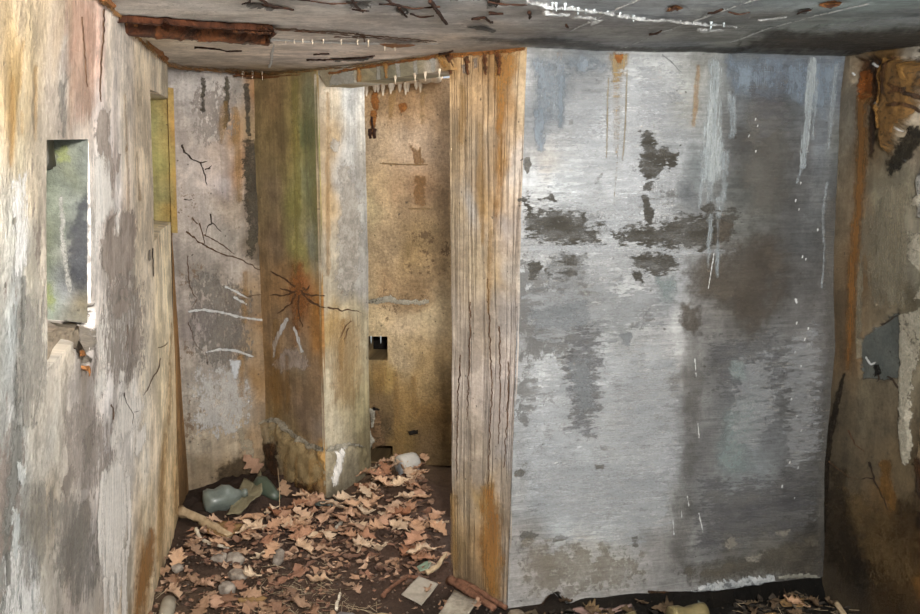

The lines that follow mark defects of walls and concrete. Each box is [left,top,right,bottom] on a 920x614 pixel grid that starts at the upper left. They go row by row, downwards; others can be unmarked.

leakage [59,196,90,292]
crack [82,9,105,102]
leakage [241,83,259,260]
crack [181,144,361,379]
rust [98,0,525,193]
rust [606,54,628,204]
leakage [497,0,920,211]
rust [846,55,920,368]
peeling [907,231,920,273]
leakage [678,201,836,592]
peeling [860,286,920,497]
rust [480,484,503,595]